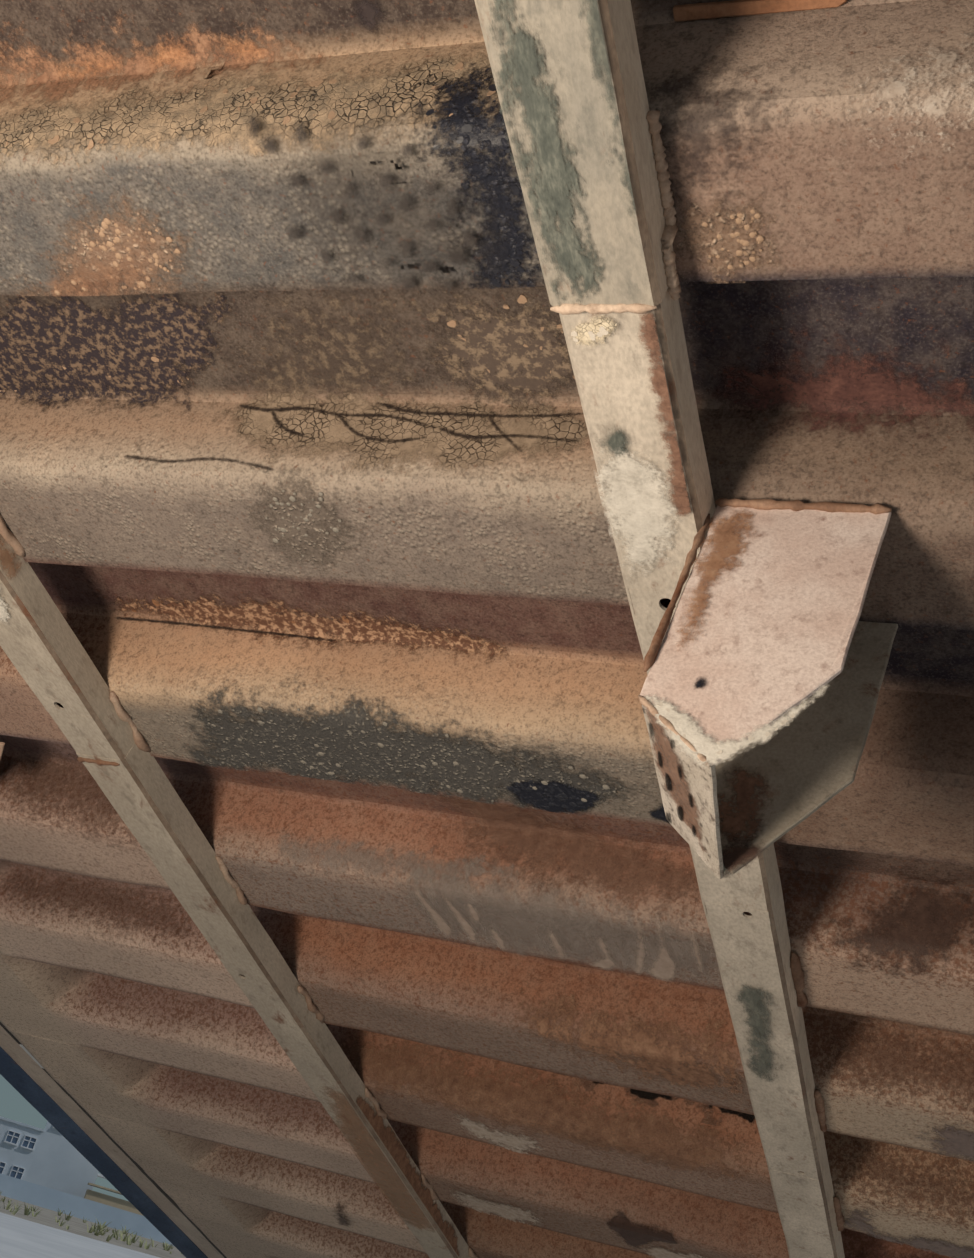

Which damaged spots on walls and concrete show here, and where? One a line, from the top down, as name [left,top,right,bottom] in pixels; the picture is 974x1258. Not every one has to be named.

rust [0,27,323,103]
peeling [0,53,617,411]
crack [125,391,588,470]
rust [639,313,691,516]
rust [711,333,974,437]
peeling [116,594,507,658]
rust [677,511,753,643]
leakage [815,872,974,975]